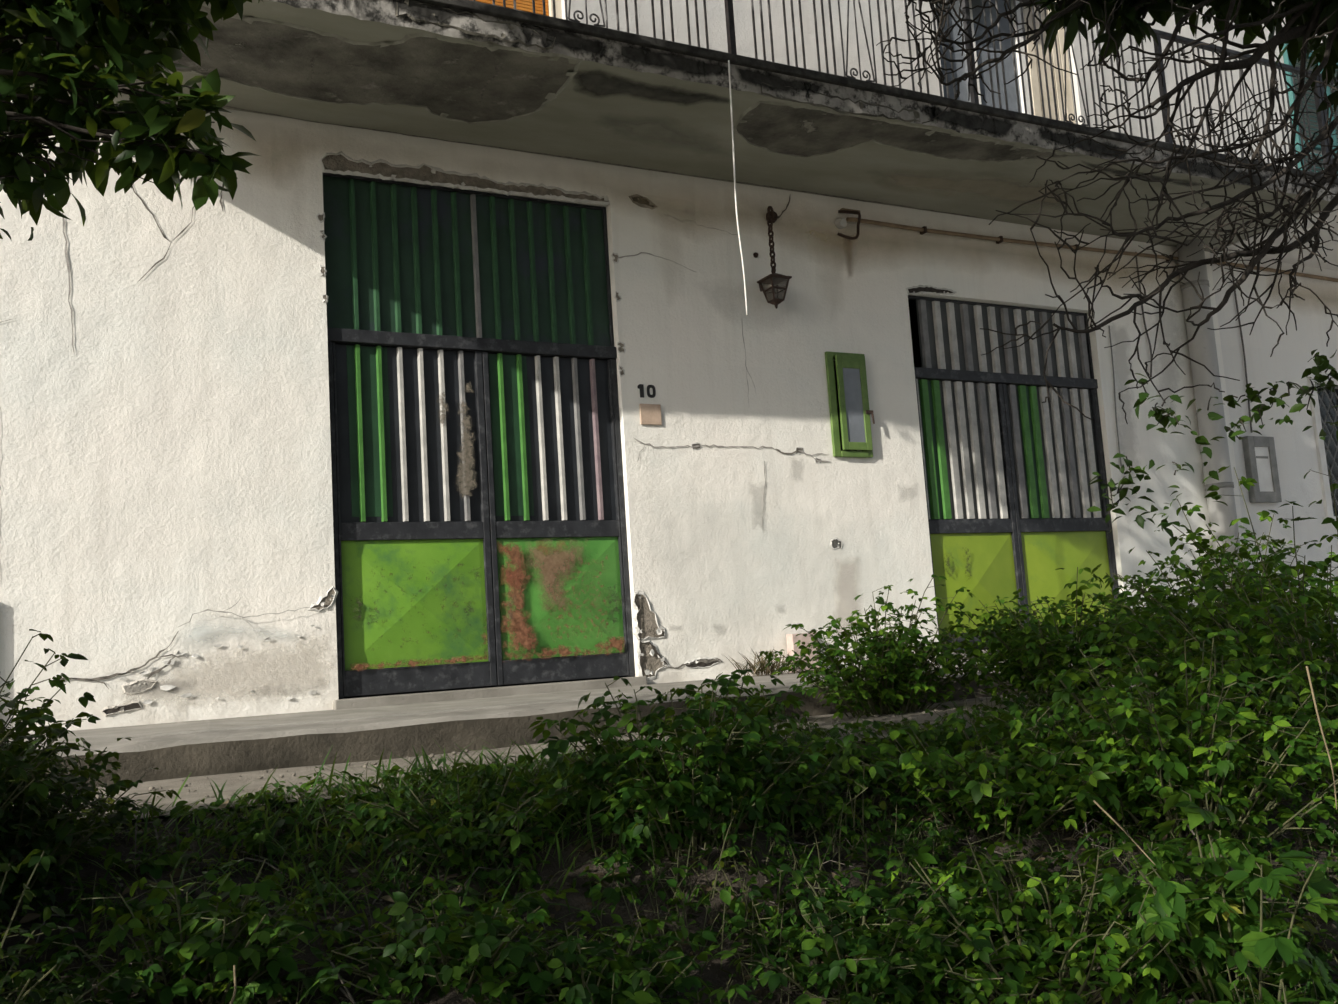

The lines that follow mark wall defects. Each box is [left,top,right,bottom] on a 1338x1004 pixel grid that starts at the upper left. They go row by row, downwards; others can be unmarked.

peeling [166,0,583,124]
peeling [733,82,1082,162]
flaking render [319,151,610,205]
crack [634,438,830,528]
crack [60,599,310,689]
corrosion [351,635,488,671]
corrosion [498,543,625,660]
flaking render [632,590,720,682]